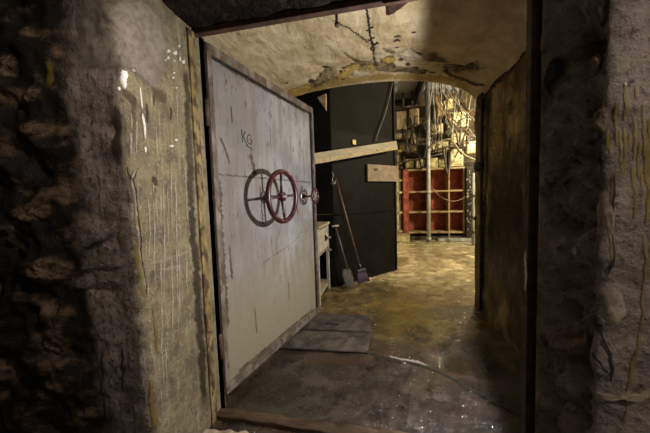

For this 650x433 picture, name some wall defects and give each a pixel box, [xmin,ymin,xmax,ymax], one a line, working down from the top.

spalling [286,35,449,97]
damp [130,87,146,158]
crack [127,167,147,295]